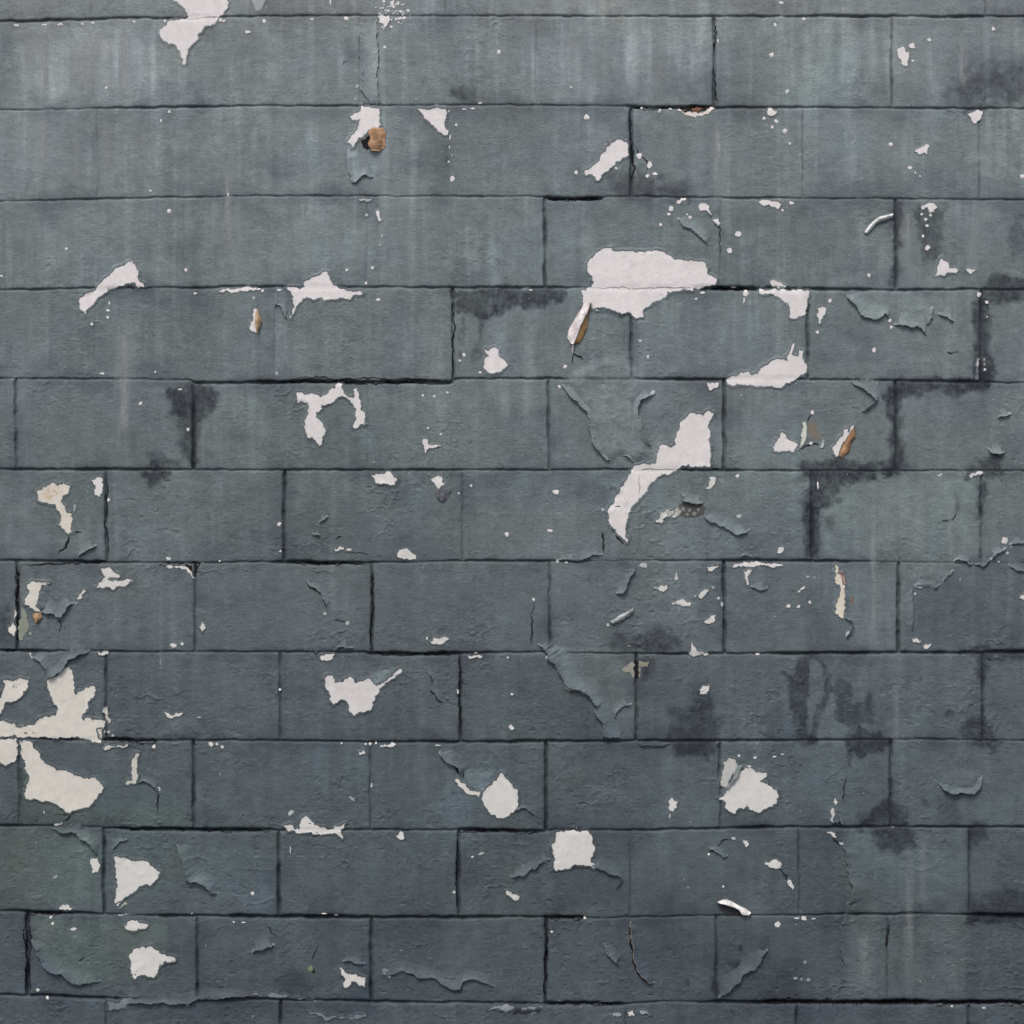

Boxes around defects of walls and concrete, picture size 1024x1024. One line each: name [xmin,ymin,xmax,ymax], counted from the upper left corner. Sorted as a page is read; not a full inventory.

peeling [157,0,231,68]
peeling [76,258,148,326]
leakage [457,286,562,318]
peeling [567,198,832,363]
peeling [705,335,811,392]
peeling [293,381,368,448]
peeling [556,406,749,564]
peeling [312,632,406,719]
peeling [357,740,398,756]
peeling [715,754,782,816]
peeling [0,644,369,1022]
peeling [503,825,625,902]